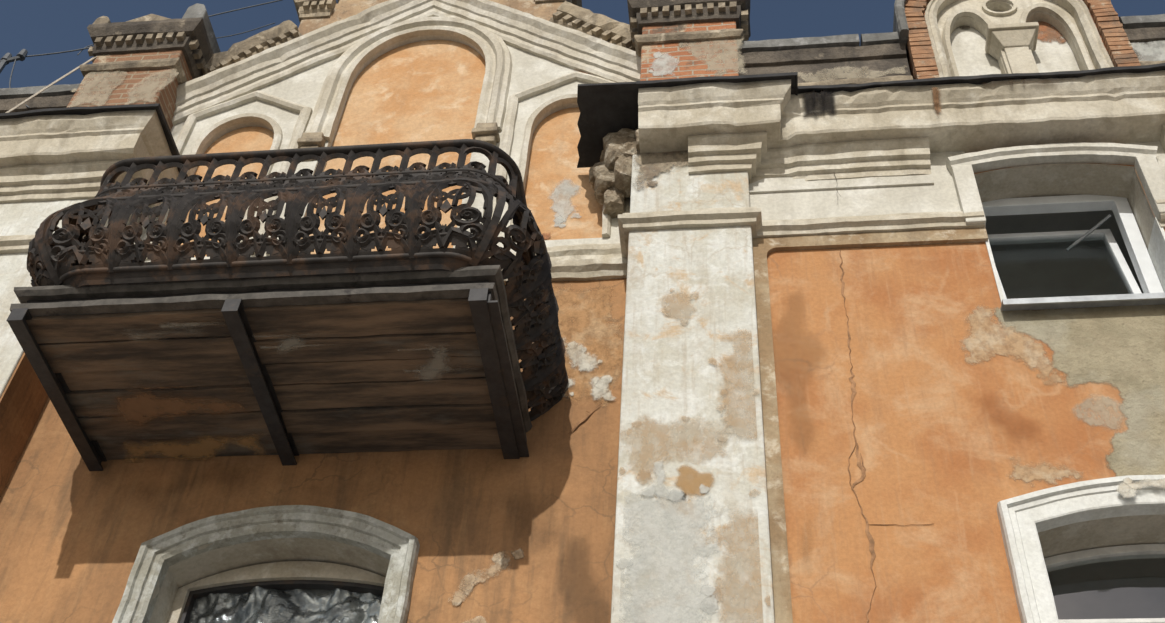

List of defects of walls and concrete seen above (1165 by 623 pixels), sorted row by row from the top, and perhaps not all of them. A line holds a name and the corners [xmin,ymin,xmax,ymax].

peeling [649,37,745,76]
spalling [542,128,688,239]
peeling [549,286,624,407]
peeling [620,330,757,501]
crack [840,250,931,623]
spalling [962,304,1165,498]
peeling [452,549,524,606]